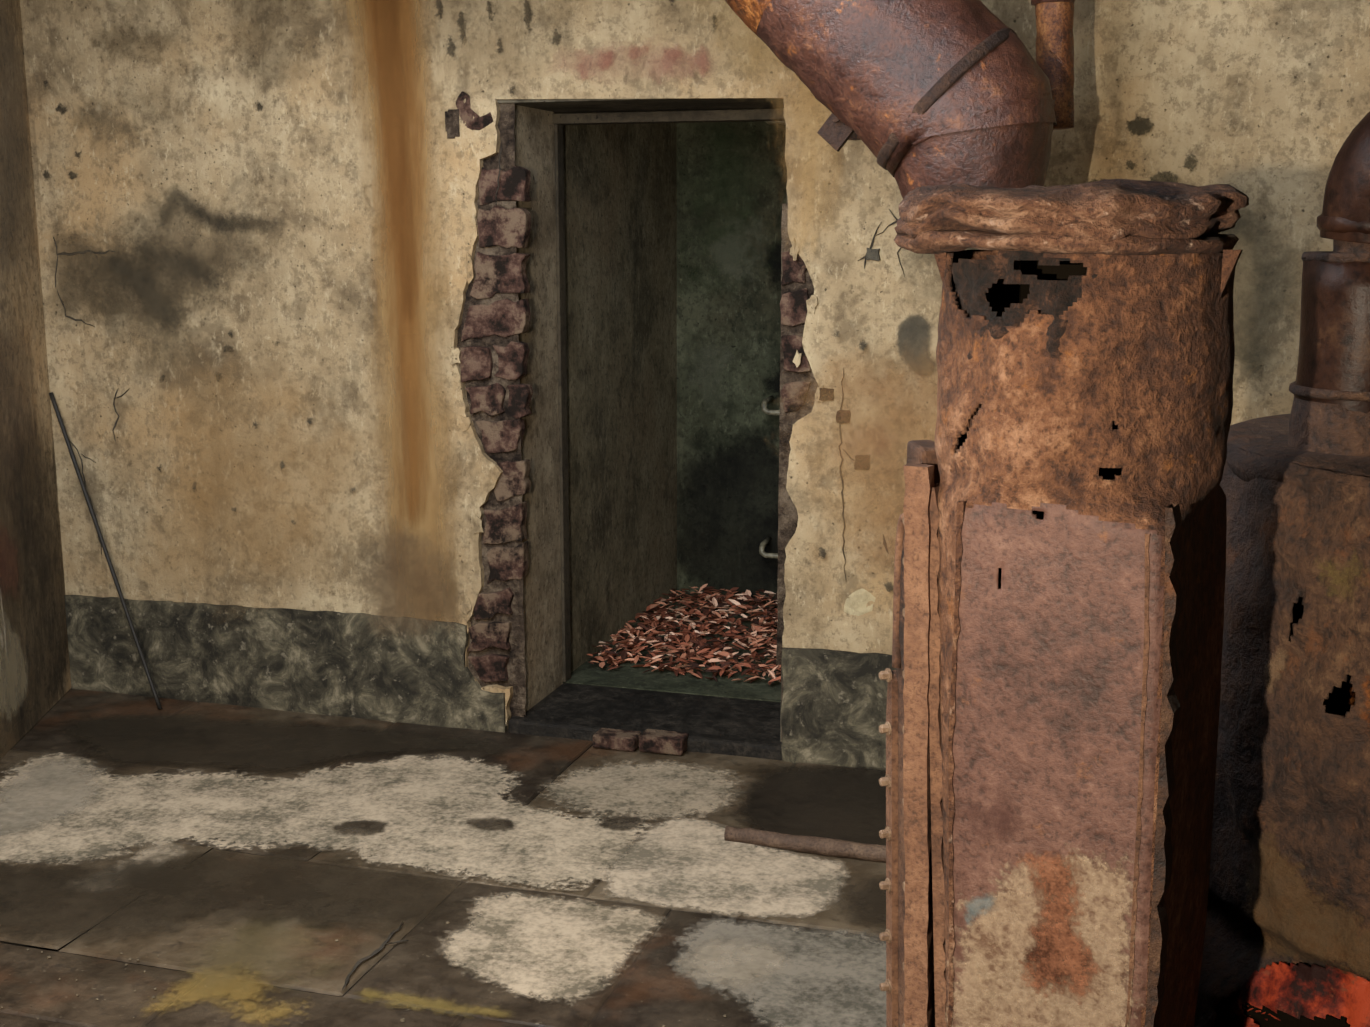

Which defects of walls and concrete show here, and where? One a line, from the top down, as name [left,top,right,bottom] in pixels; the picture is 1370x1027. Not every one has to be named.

water stain [57,192,261,327]
rust [346,0,452,622]
flaking render [445,91,533,717]
flaking render [776,204,824,665]
water stain [68,715,501,770]
water stain [847,878,886,924]